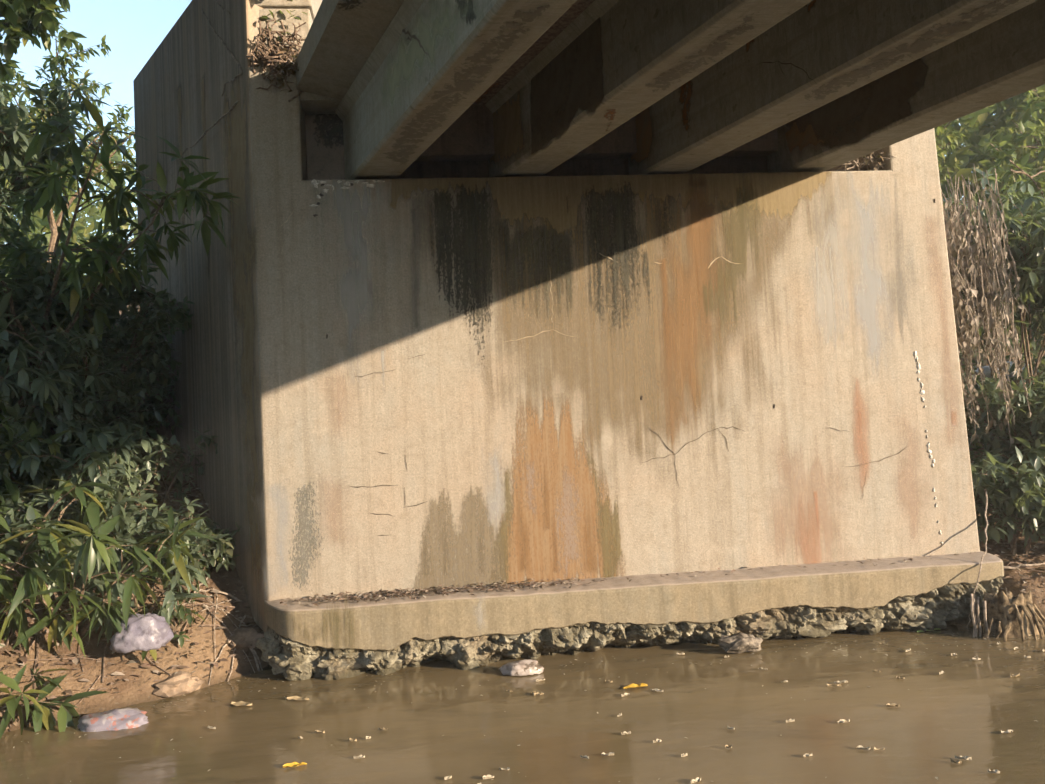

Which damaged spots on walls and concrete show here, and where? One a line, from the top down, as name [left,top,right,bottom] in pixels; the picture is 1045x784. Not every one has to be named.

leakage [390,17,831,453]
leakage [913,351,926,408]
leakage [414,471,512,590]
rust [491,397,623,584]
leakage [598,498,622,578]
crack [642,426,741,486]
rust [856,394,868,483]
spalling [255,577,1003,681]